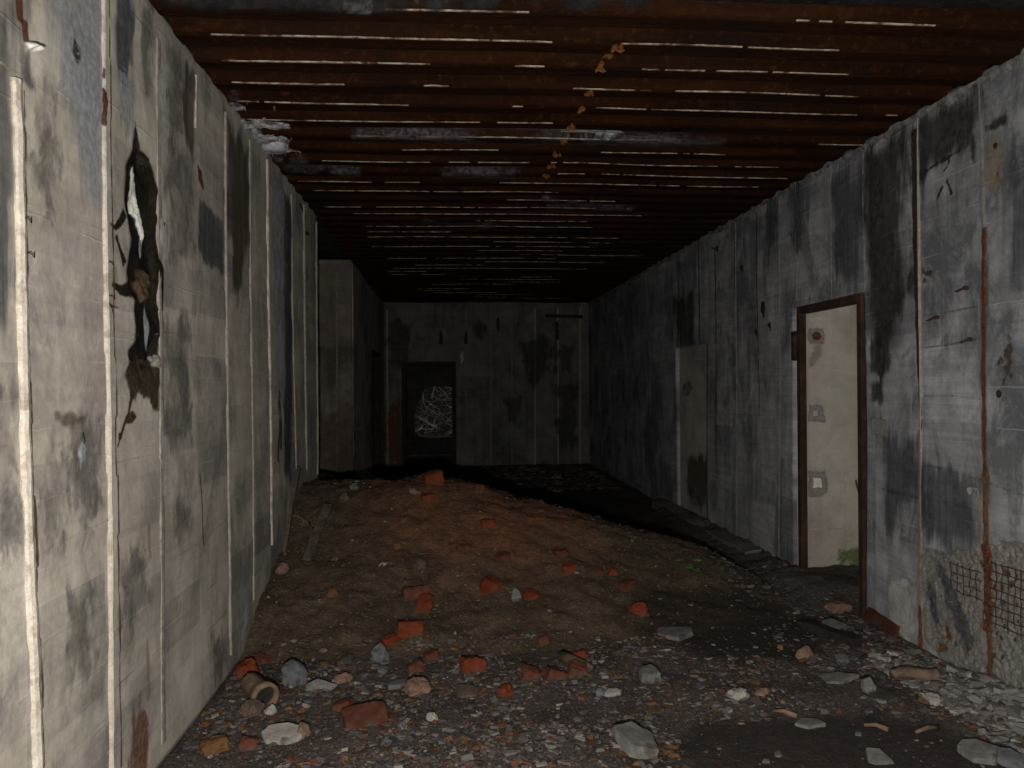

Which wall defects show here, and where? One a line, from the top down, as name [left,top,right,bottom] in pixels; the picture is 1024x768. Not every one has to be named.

damp [675,90,859,98]
damp [164,54,801,299]
damp [872,375,883,404]
rust [981,227,993,676]
spalling [919,540,1024,689]